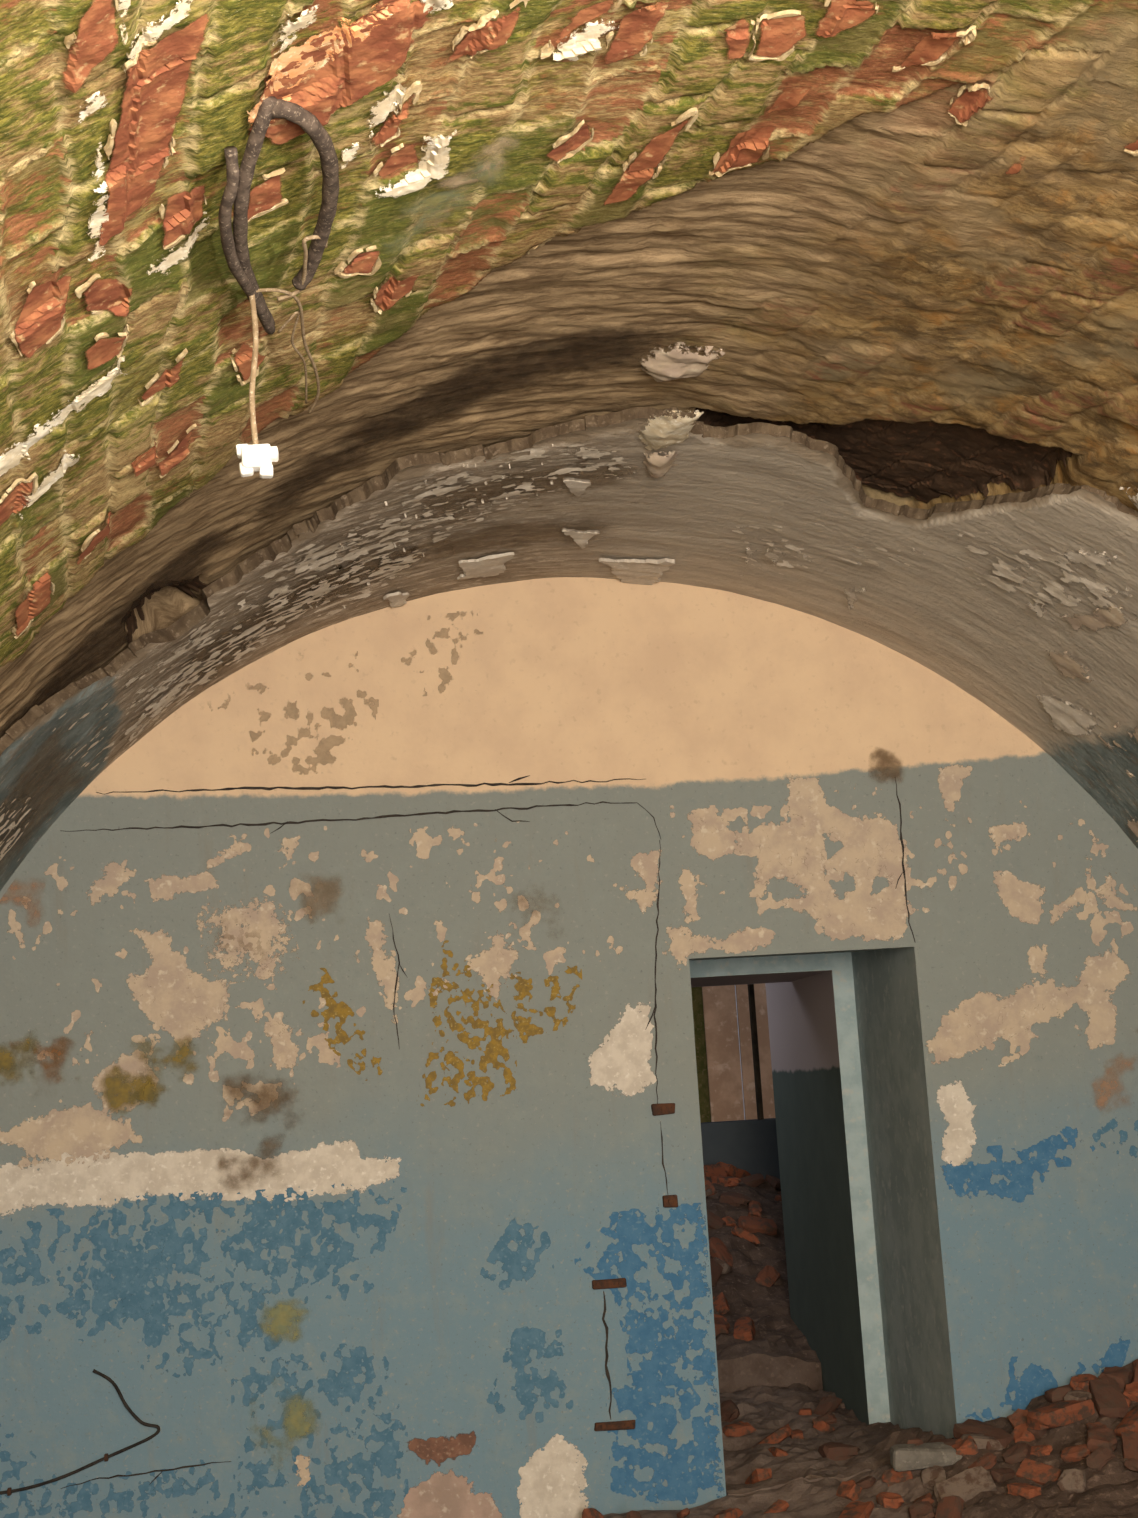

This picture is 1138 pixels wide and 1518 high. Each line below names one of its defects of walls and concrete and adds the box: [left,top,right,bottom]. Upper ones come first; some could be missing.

spalling [247,0,434,177]
spalling [724,0,879,61]
spalling [693,408,1072,504]
peeling [52,444,635,770]
peeling [613,764,973,970]
peeling [926,800,1138,1070]
peeling [588,1002,657,1096]
peeling [0,928,604,1518]
peeling [936,1080,1138,1203]
crack [602,1291,612,1419]
peeling [574,1162,835,1518]
peeling [836,1338,1138,1518]